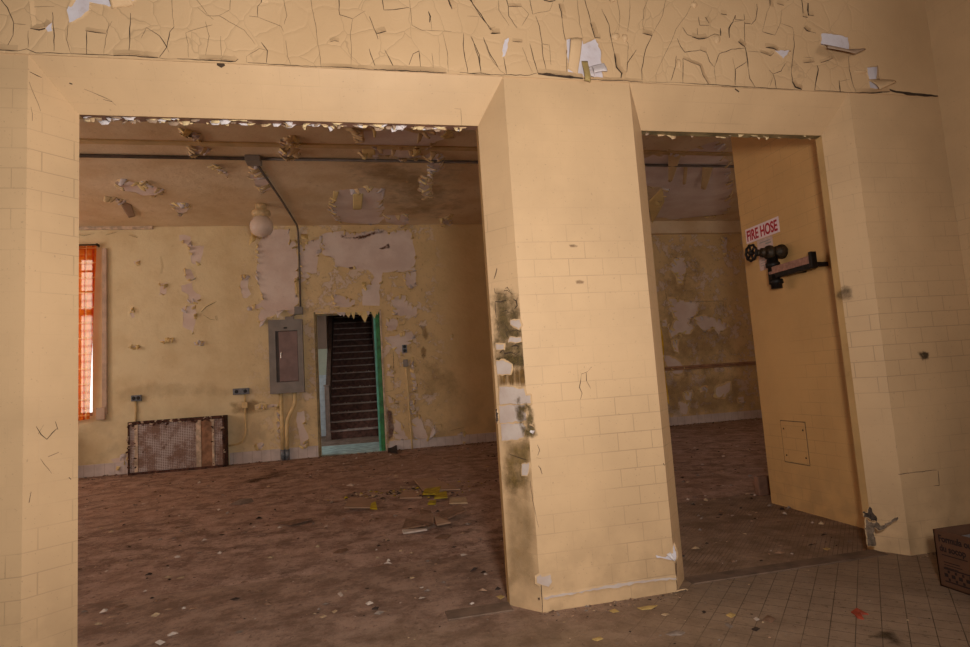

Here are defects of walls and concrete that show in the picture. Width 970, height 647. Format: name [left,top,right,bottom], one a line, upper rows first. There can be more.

crack [0,0,938,120]
peeling [102,178,193,218]
peeling [80,115,478,200]
peeling [641,131,820,223]
peeling [246,185,420,379]
damp [495,293,524,366]
peeling [660,296,732,377]
peeling [386,393,419,441]
peeling [495,318,535,443]
damp [507,400,535,488]
peeling [520,461,531,477]
spalling [863,507,898,547]